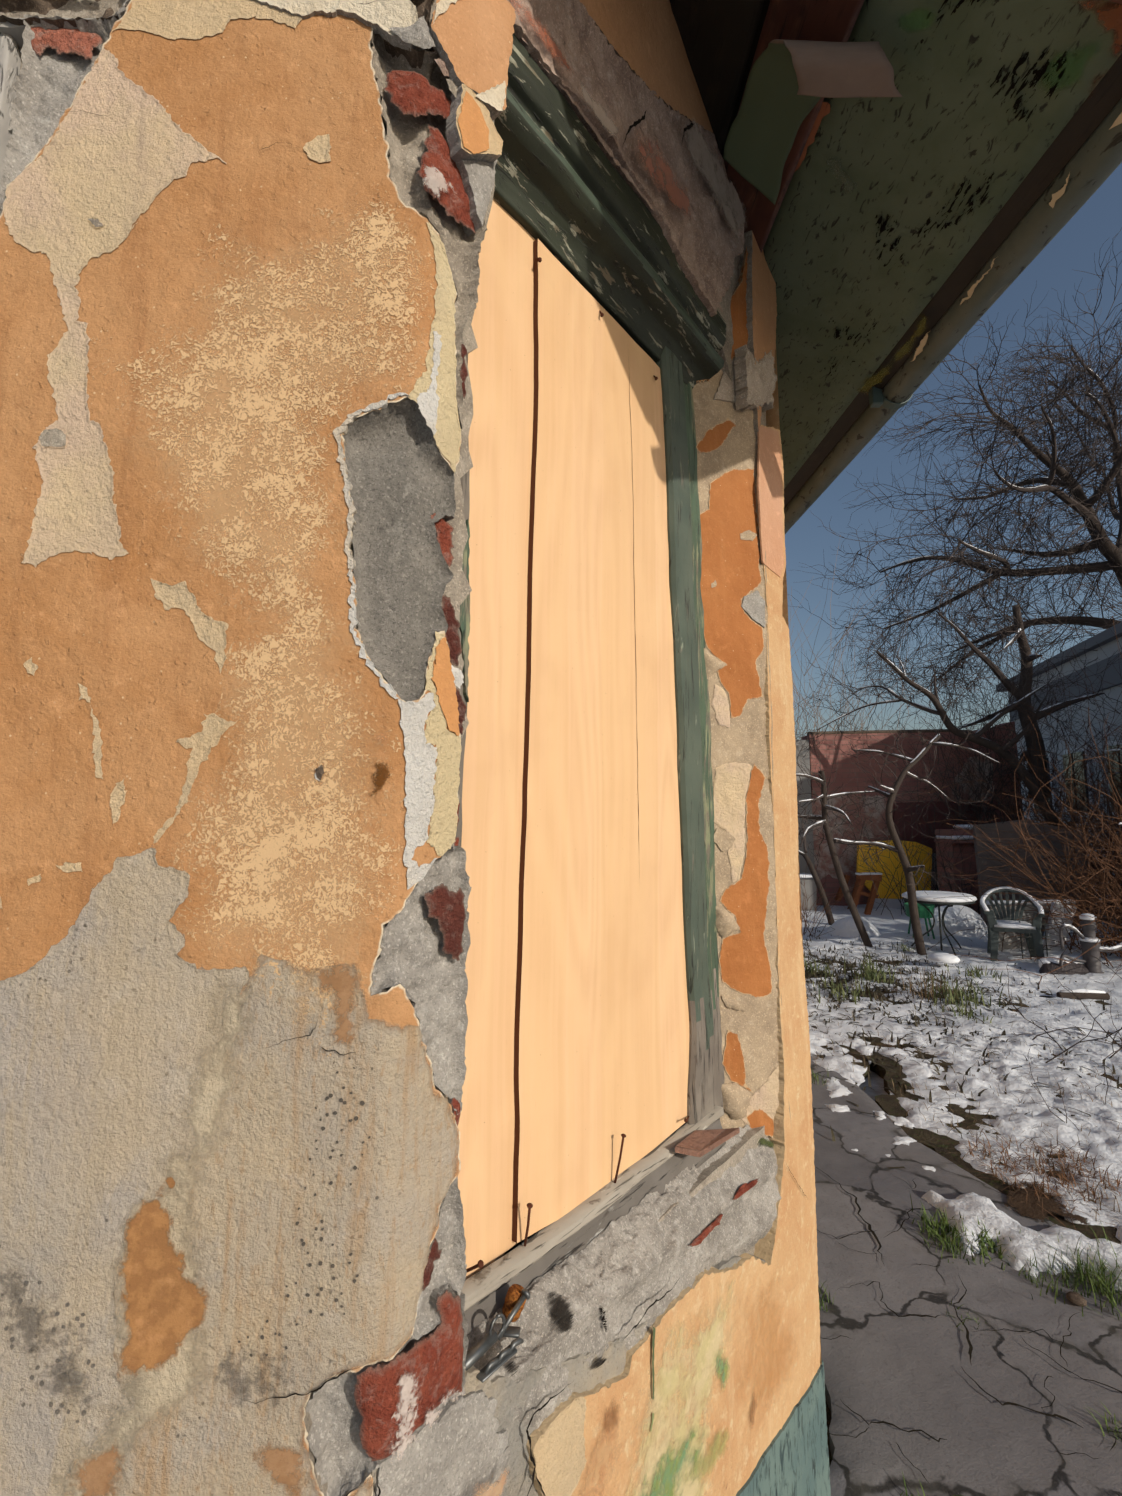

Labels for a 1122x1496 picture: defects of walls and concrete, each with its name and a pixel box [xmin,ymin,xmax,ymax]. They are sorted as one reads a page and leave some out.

peeling [700,468,766,728]
flaking render [0,0,745,1496]
peeling [713,762,772,1011]
peeling [721,1030,779,1138]
flaking render [688,1178,759,1247]
spalling [714,1255,765,1270]
crack [785,1161,1122,1459]
crack [829,1399,947,1483]